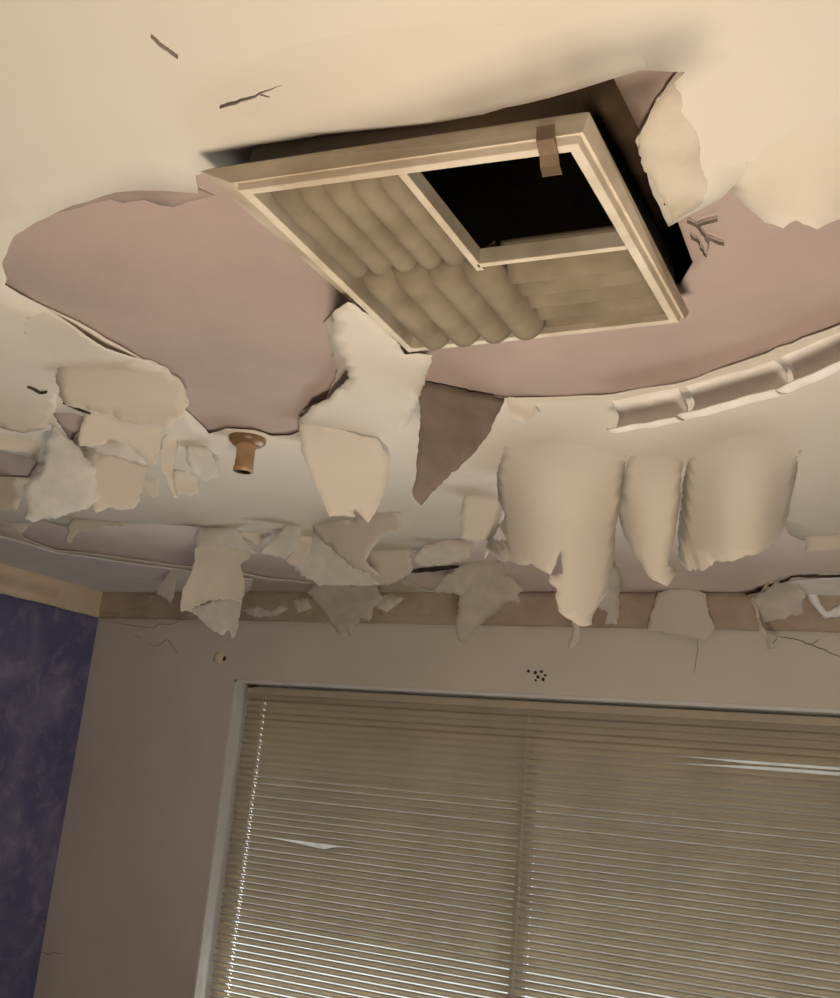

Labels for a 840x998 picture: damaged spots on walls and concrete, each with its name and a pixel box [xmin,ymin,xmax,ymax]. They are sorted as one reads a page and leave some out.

peeling [0,70,840,651]